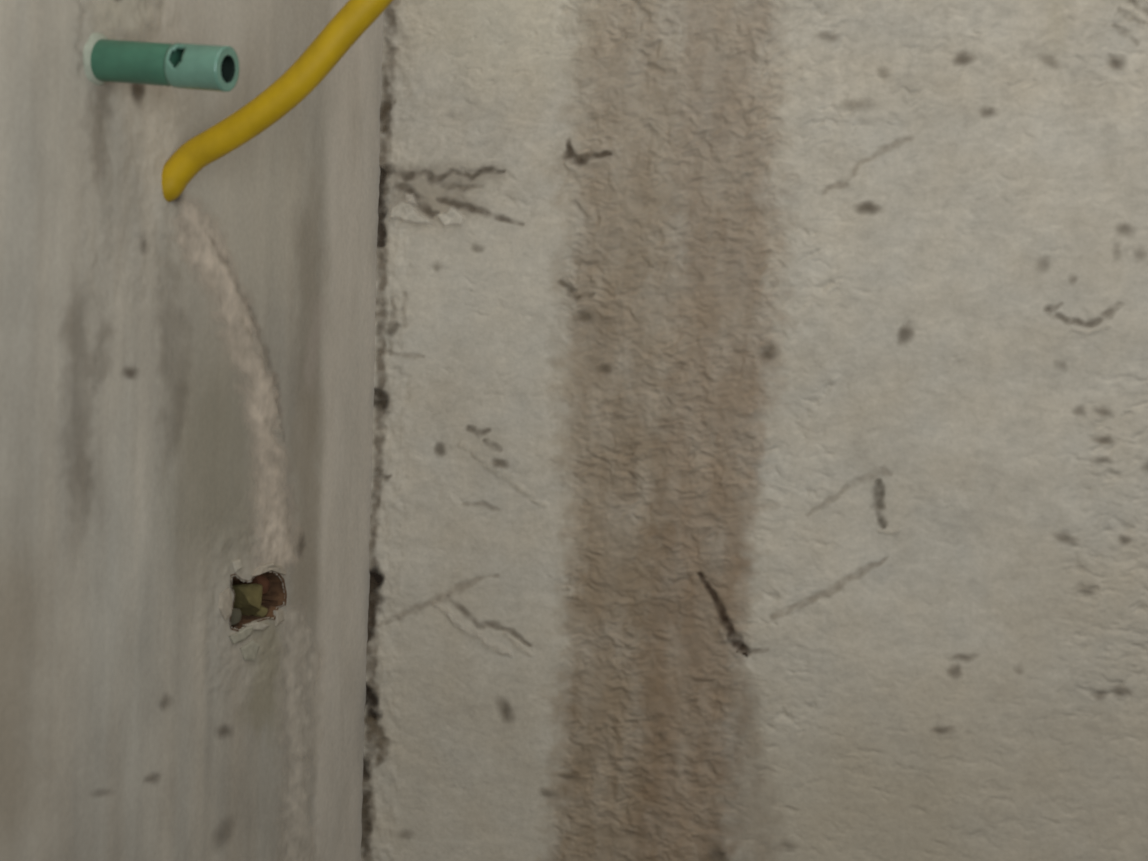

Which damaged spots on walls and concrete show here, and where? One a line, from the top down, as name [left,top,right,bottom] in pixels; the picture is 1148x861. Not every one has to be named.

spalling [219,559,287,661]
crack [699,572,747,650]